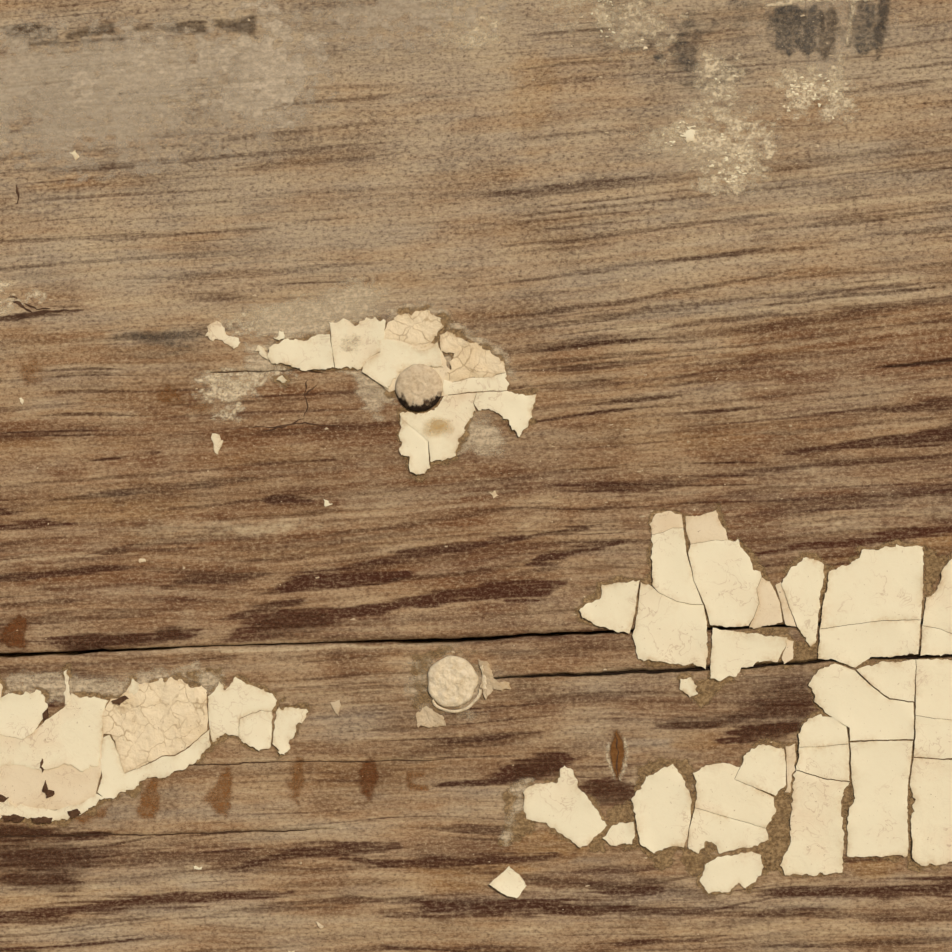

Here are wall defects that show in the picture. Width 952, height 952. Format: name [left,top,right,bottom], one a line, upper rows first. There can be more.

peeling [205,280,538,481]
peeling [0,662,310,827]
crack [494,667,710,679]
peeling [498,504,952,896]
crack [741,659,834,669]
crack [869,653,952,661]